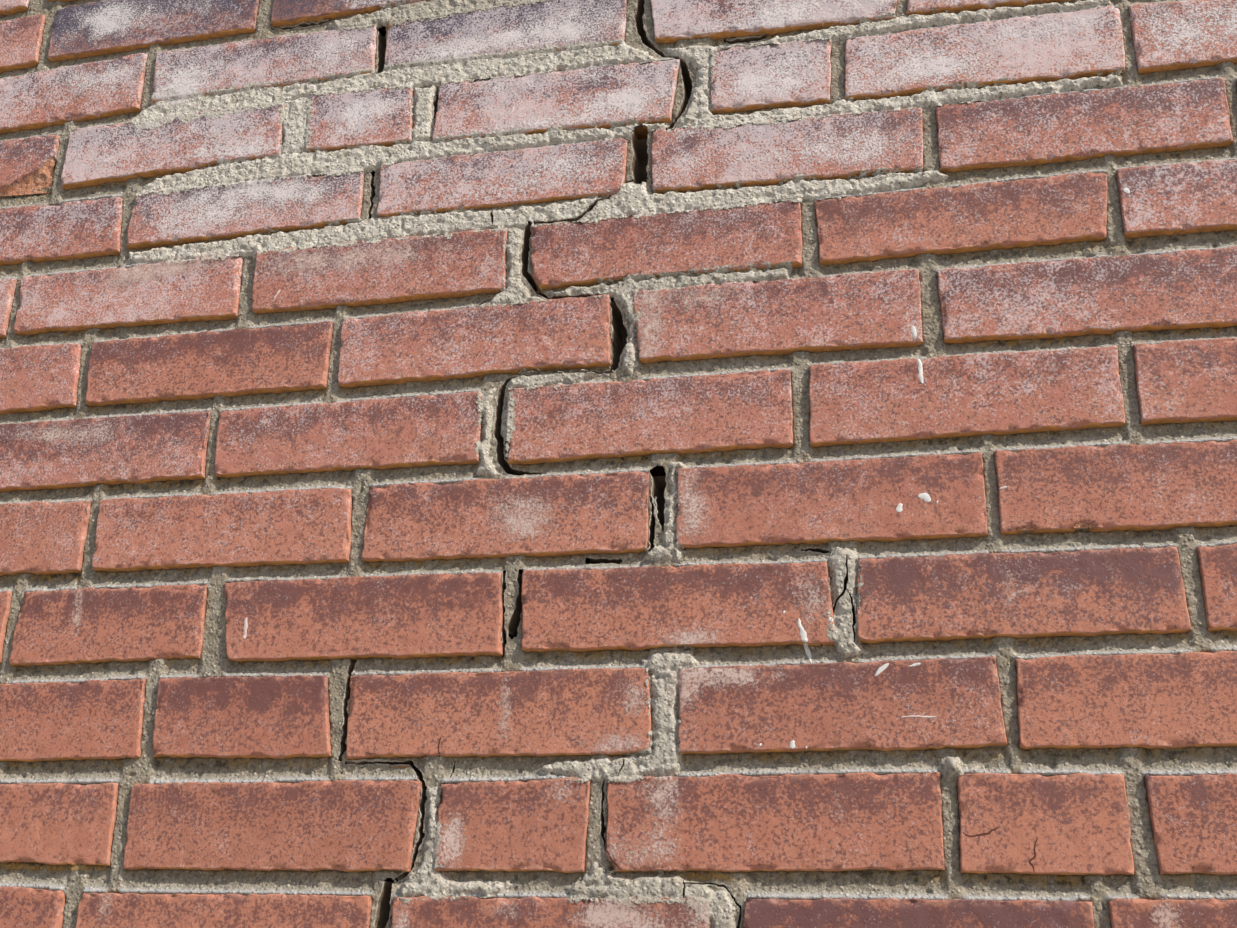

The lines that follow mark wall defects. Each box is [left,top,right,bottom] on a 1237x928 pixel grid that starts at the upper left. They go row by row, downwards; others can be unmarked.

crack [431,87,439,136]
crack [487,208,495,225]
crack [492,0,694,477]
crack [648,472,668,551]
crack [501,572,522,656]
crack [588,557,620,566]
crack [802,547,857,647]
crack [337,659,457,928]
crack [598,759,625,870]
crack [680,878,743,928]